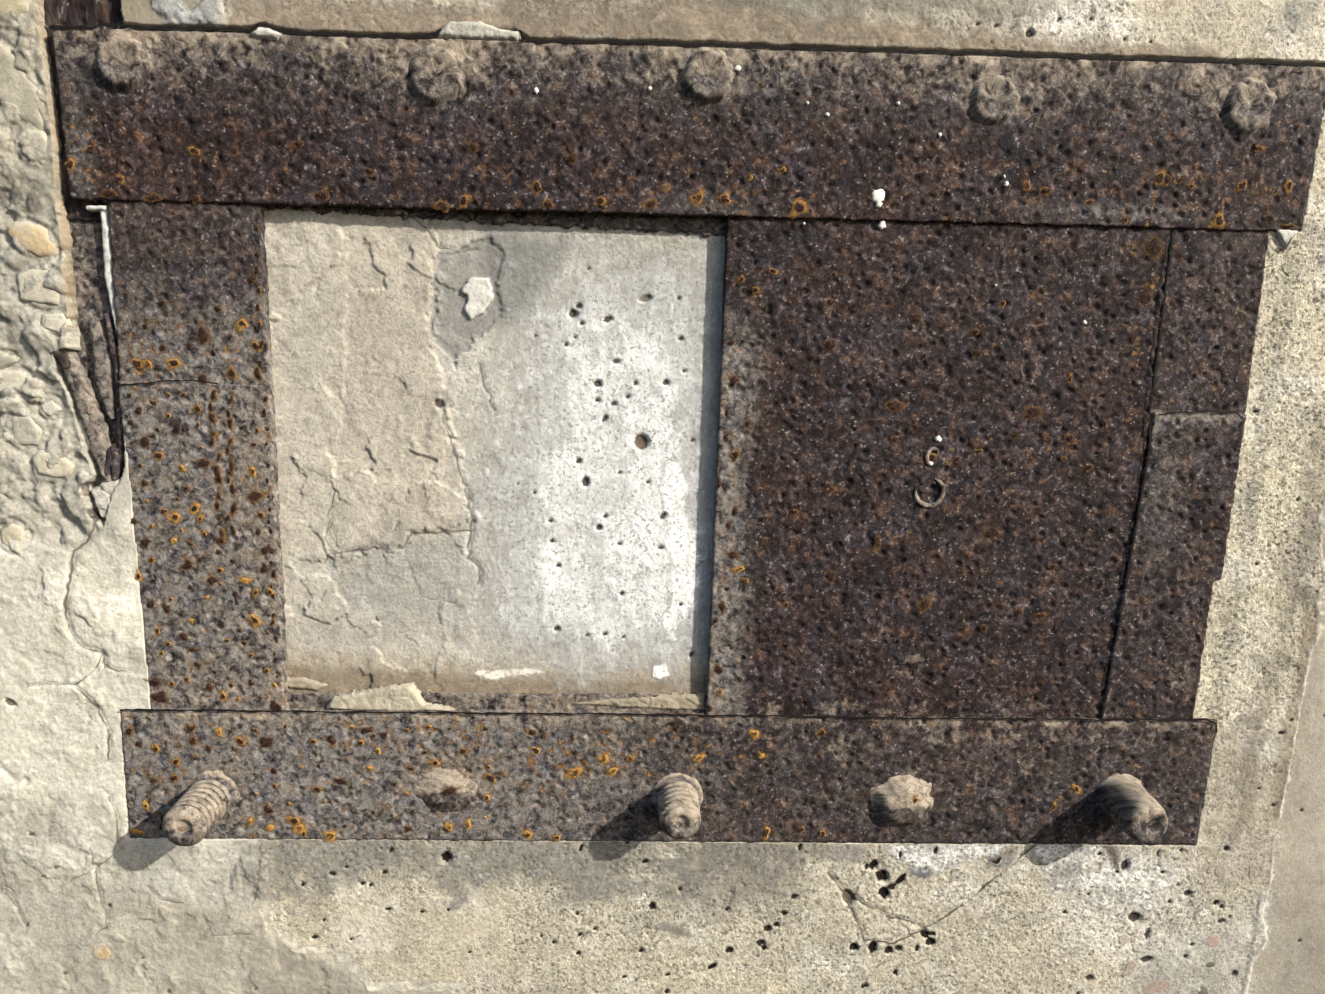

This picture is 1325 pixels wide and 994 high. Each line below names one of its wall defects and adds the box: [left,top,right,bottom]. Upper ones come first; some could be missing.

crack [414,219,479,252]
rust [237,252,264,380]
crack [27,237,1243,760]
rust [127,365,723,728]
rust [125,727,181,835]
rust [185,724,273,762]
rust [247,792,307,836]
rust [309,725,388,803]
rust [444,765,496,831]
rust [749,728,766,759]
crack [0,875,27,931]
crack [54,796,120,932]